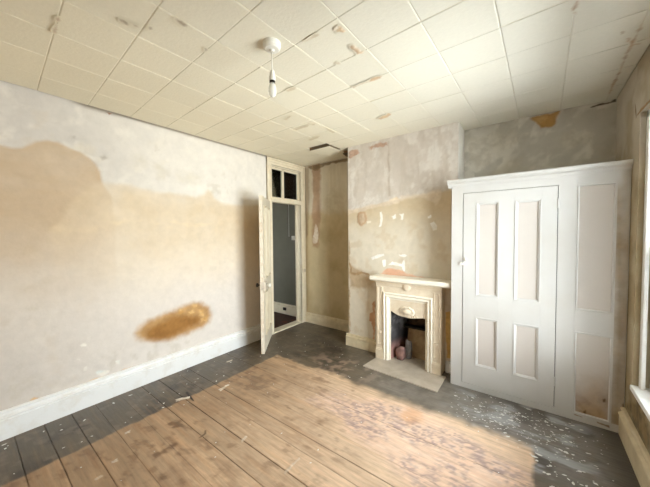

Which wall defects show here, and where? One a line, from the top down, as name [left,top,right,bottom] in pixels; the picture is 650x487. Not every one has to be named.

spalling [371,253,428,278]
peeling [368,300,376,339]